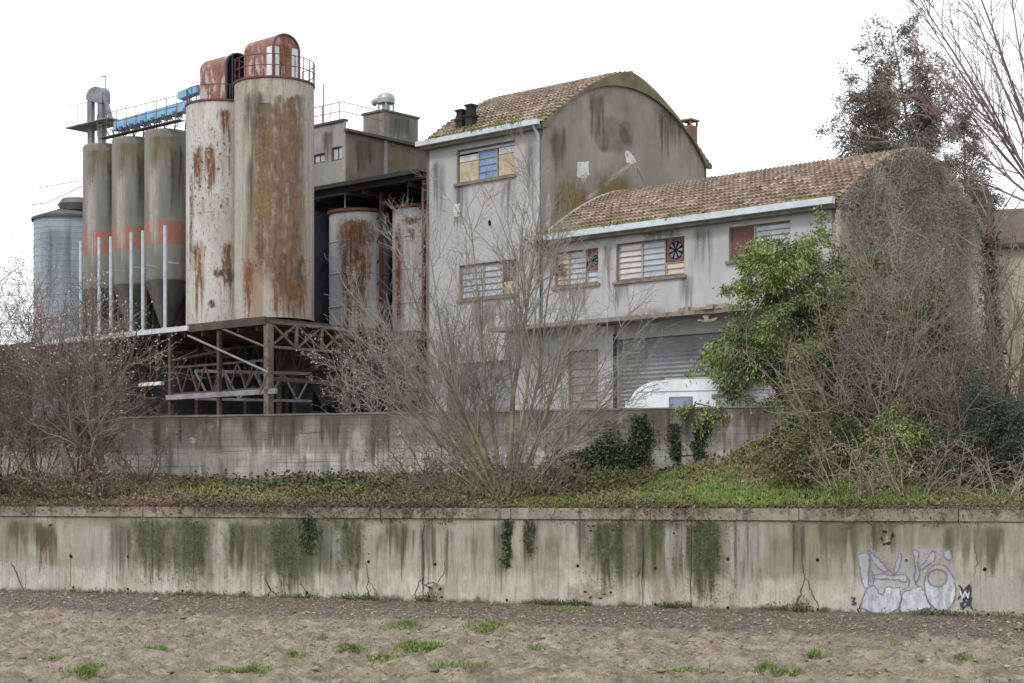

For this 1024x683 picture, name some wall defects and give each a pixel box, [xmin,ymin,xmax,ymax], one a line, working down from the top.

corrosion [190,95,304,317]
corrosion [339,219,375,327]
crack [415,521,446,599]
crack [796,542,820,612]